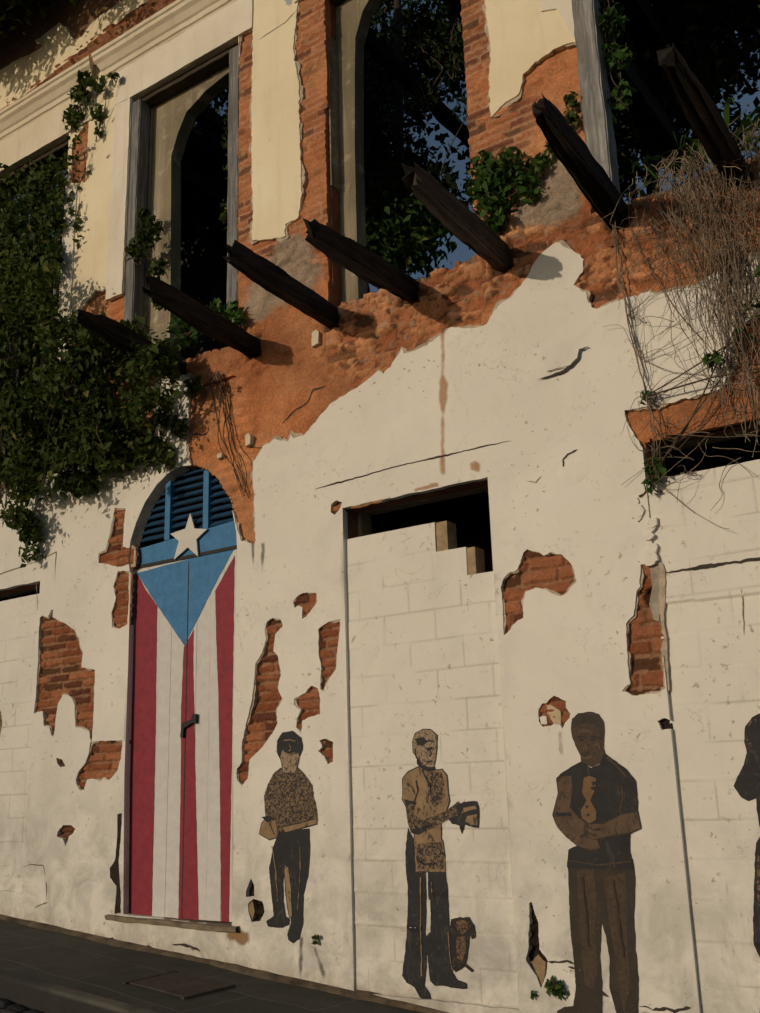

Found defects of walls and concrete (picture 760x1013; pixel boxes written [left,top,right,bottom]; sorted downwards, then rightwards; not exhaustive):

flaking render [0,0,176,94]
flaking render [185,0,760,543]
crack [317,441,507,489]
flaking render [100,508,143,628]
flaking render [503,550,575,633]
flaking render [627,497,670,696]
crack [665,557,760,573]
flaking render [36,615,95,731]
flaking render [79,738,132,789]
flaking render [239,619,283,784]
flaking render [296,622,340,729]
spalling [539,696,570,727]